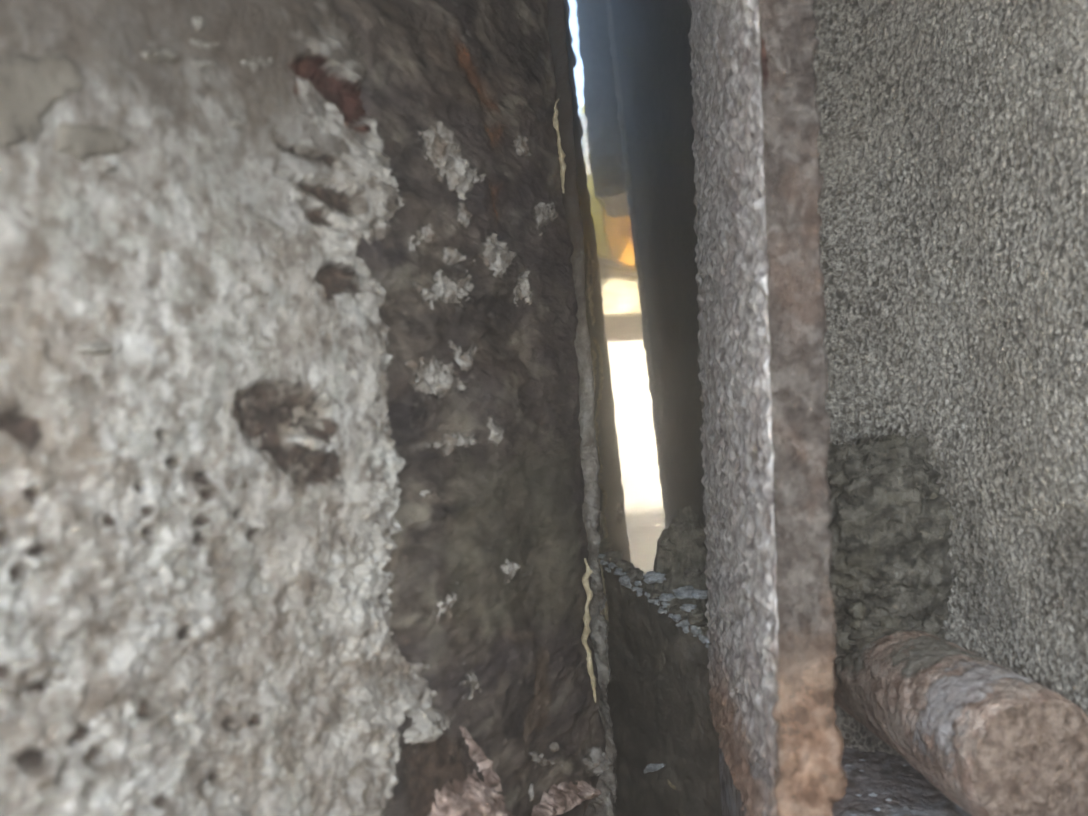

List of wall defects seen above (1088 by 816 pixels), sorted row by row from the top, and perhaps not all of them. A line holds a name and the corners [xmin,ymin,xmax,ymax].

corrosion [287,56,371,133]
peeling [281,145,335,166]
peeling [297,183,350,226]
spalling [231,376,340,493]
spalling [331,0,606,816]
crack [581,241,609,703]